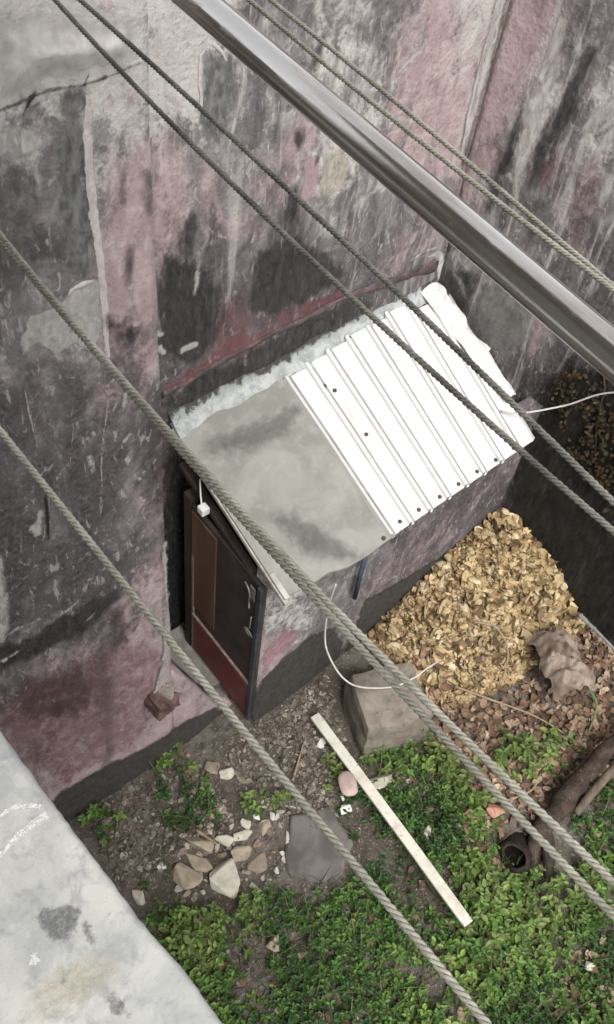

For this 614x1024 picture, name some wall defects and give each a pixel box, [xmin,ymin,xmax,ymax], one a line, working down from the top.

crack [0,67,130,111]
water stain [486,18,596,211]
water stain [598,174,614,209]
water stain [159,213,221,364]